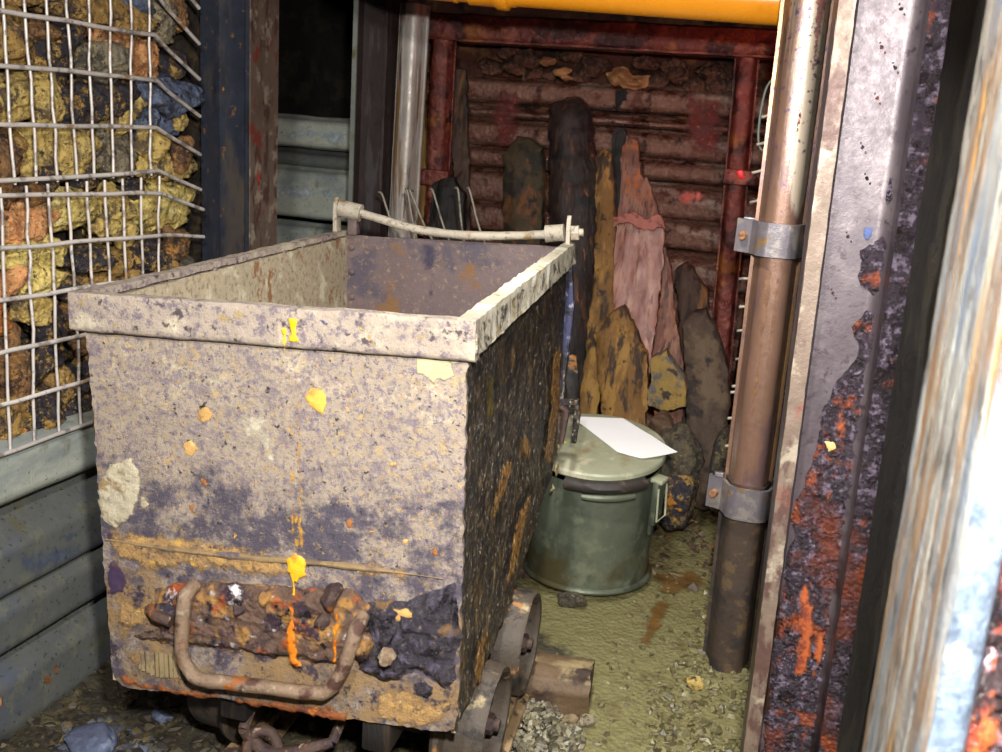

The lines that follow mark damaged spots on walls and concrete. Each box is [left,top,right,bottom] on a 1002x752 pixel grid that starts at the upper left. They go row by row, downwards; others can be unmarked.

rust [824,414,845,452]
rust [795,586,823,675]